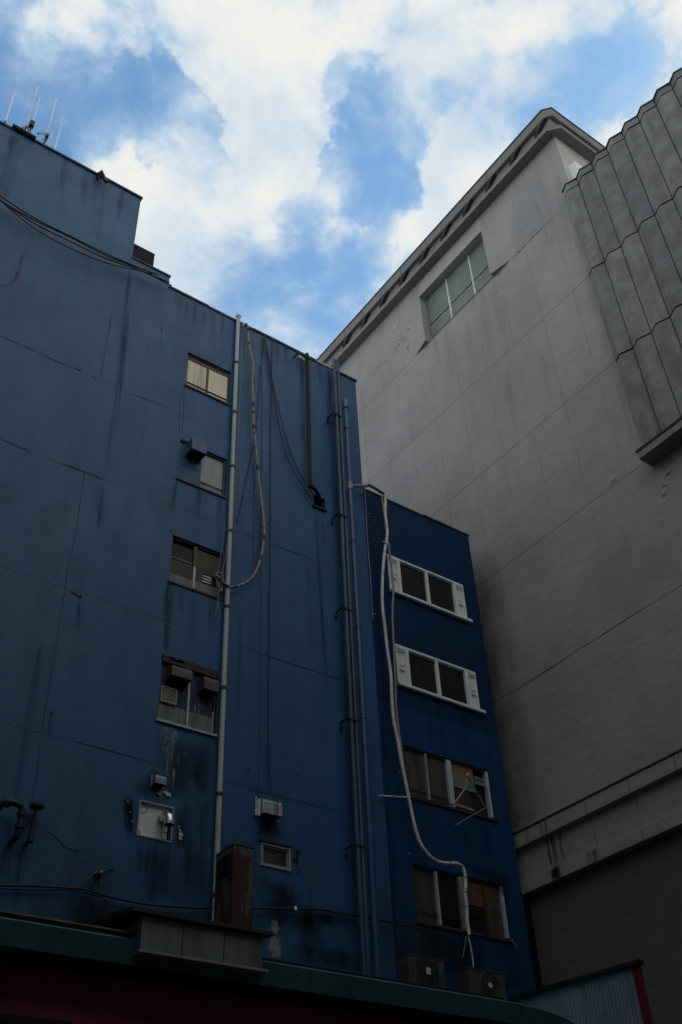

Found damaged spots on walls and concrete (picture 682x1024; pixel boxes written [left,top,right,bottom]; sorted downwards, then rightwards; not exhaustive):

spalling [268,921,281,957]